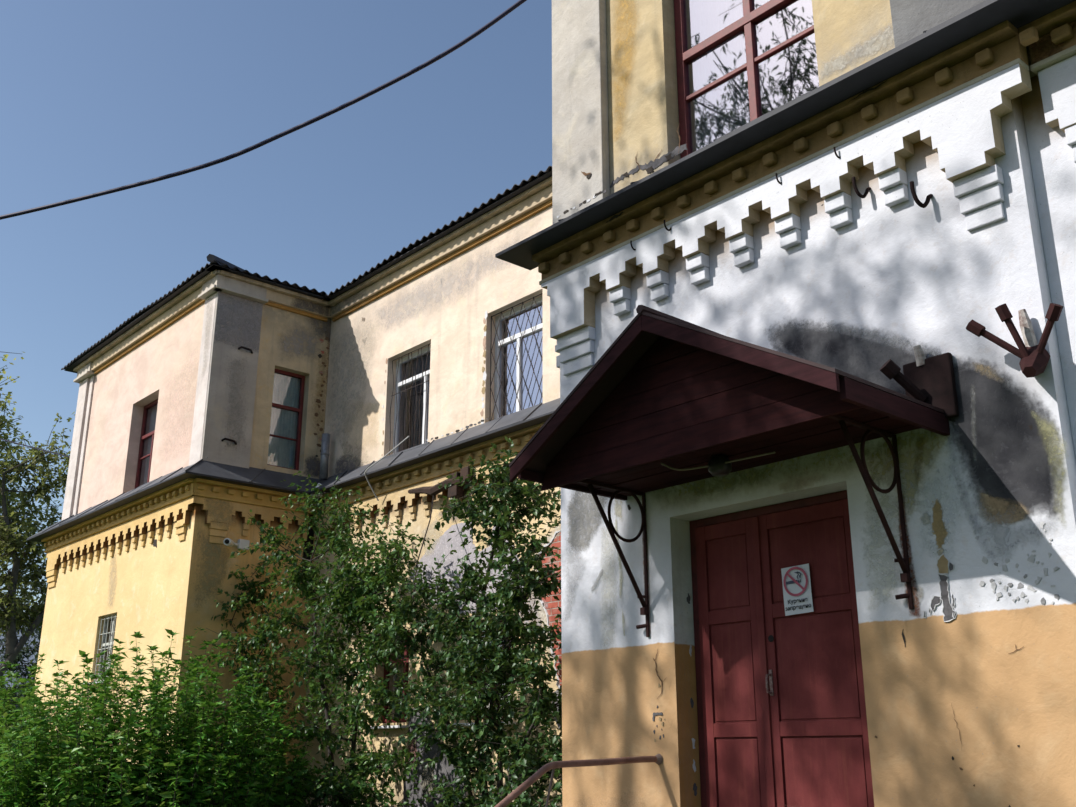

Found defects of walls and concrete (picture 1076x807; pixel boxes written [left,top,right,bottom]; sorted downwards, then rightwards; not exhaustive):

leakage [769,322,934,395]
leakage [659,360,1064,554]
leakage [566,491,621,613]
peeling [923,498,957,622]
peeling [979,522,1060,605]